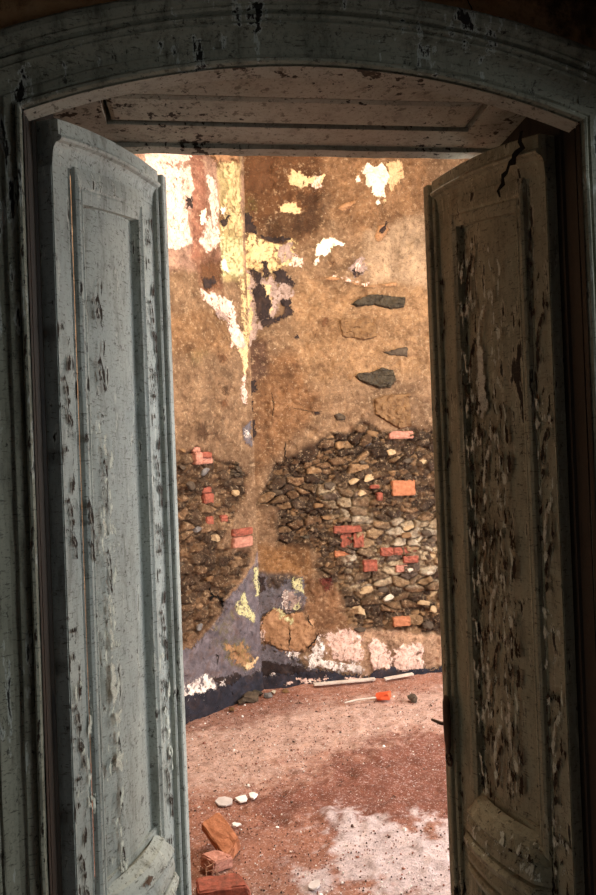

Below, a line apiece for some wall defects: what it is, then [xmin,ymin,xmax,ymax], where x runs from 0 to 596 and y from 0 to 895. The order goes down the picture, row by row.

peeling [354,159,404,205]
peeling [144,153,344,404]
flaking render [351,294,406,310]
flaking render [355,367,427,464]
peeling [149,283,174,822]
flaking render [178,424,218,504]
flaking render [192,515,253,548]
flaking render [313,503,364,557]
flaking render [348,460,416,501]
flaking render [359,525,438,630]
peeling [458,225,524,810]
flaking render [347,605,366,633]